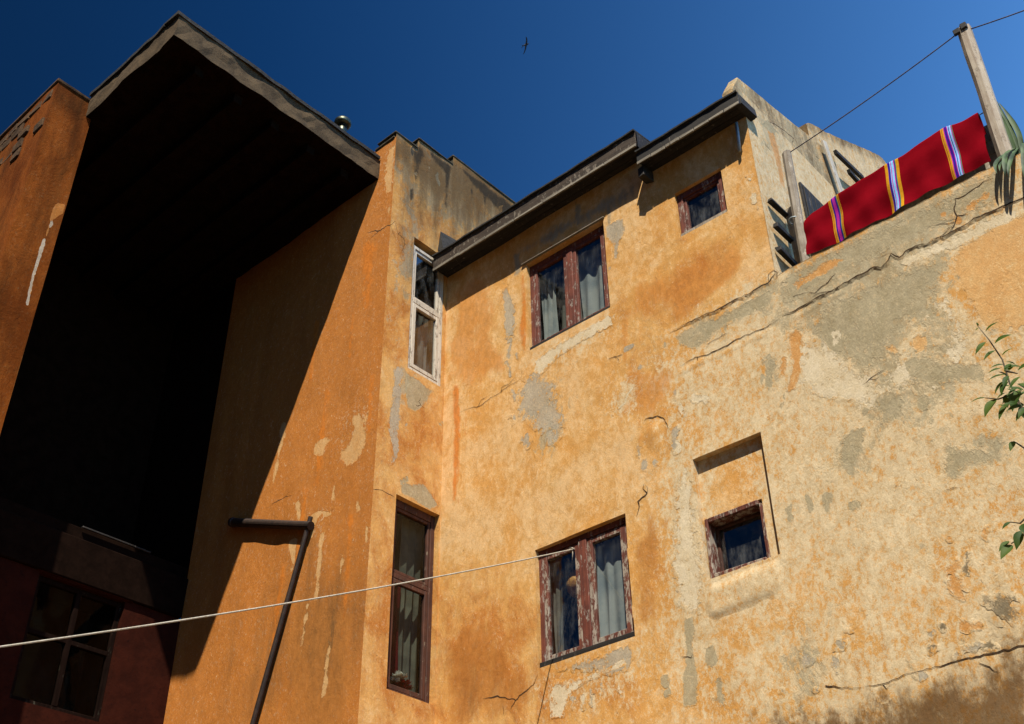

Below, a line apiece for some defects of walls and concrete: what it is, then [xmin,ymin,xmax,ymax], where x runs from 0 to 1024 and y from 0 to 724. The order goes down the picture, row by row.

flaking render [26,203,65,305]
flaking render [663,161,1014,351]
crack [671,178,1024,367]
flaking render [502,285,567,451]
flaking render [760,353,788,429]
flaking render [793,248,992,476]
peeling [312,437,332,457]
flaking render [928,438,1001,481]
flaking render [785,492,834,523]
crack [483,679,536,714]
flaking render [540,642,636,711]
crack [825,645,1024,689]